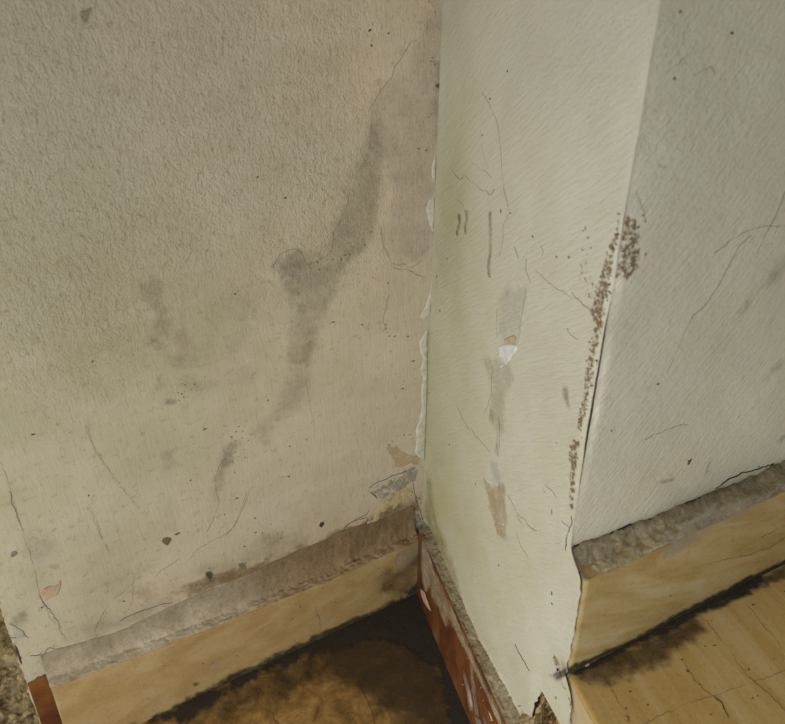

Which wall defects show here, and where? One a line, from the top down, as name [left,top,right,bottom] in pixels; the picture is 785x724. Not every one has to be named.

crack [684,193,785,334]
flaking render [497,335,517,368]
flaking render [345,330,429,527]
crack [3,470,65,656]
crack [96,577,173,637]
spalling [516,692,556,724]